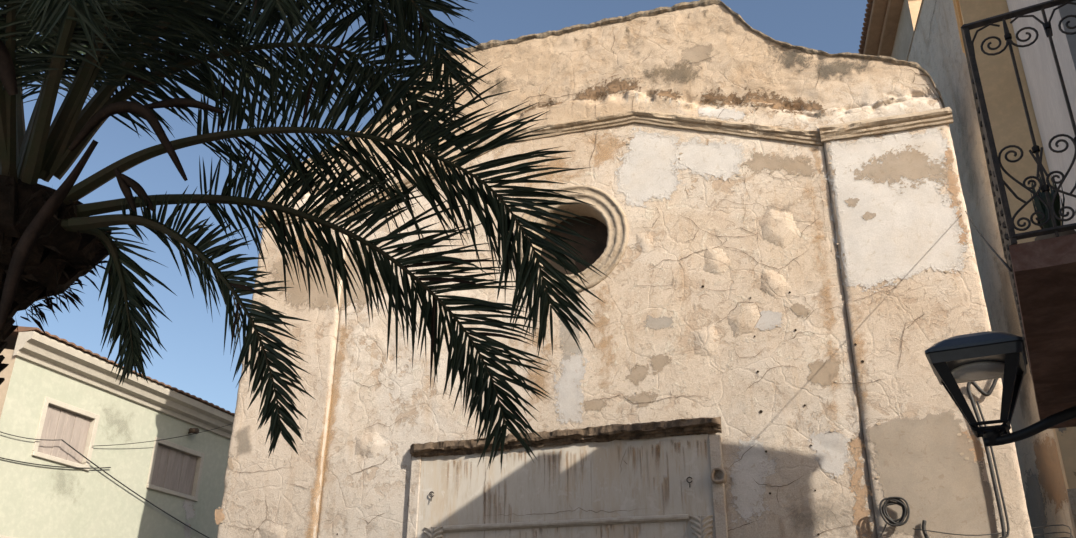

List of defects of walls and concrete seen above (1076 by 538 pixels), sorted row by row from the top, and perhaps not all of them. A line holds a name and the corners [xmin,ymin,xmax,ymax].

crack [522,87,599,173]
spalling [520,74,682,116]
peeling [680,43,713,65]
spalling [696,87,825,121]
crack [636,172,828,291]
peeling [614,126,971,292]
peeling [554,298,607,425]
crack [706,285,907,392]
crack [839,310,924,390]
peeling [727,434,778,526]
peeling [808,409,1000,538]